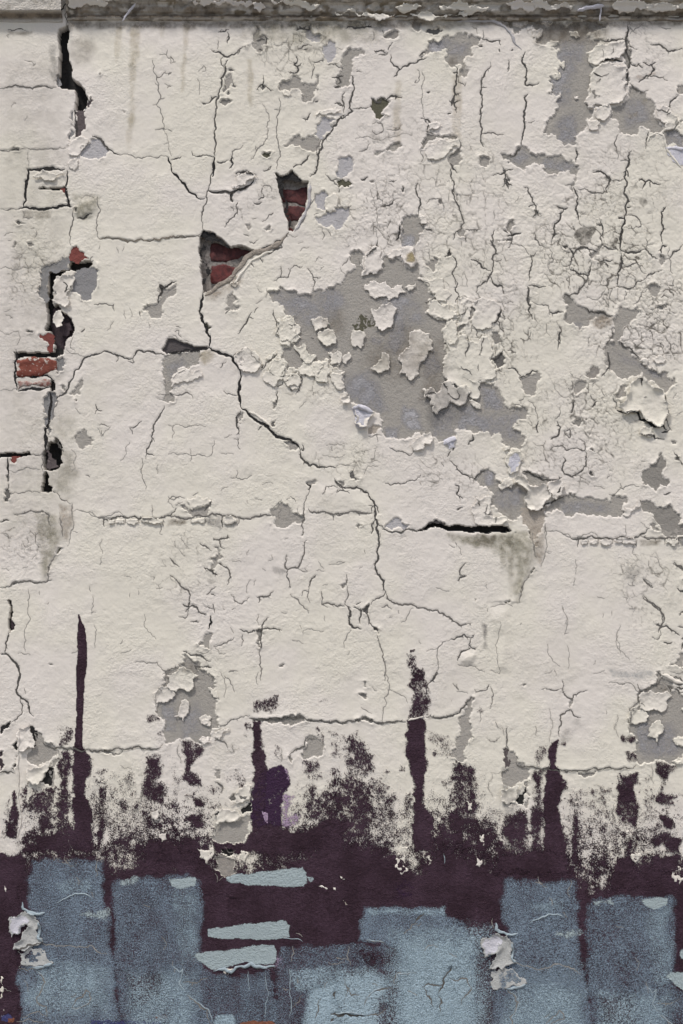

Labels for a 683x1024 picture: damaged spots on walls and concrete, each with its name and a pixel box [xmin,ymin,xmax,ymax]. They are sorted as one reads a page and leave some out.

peeling [335,0,489,77]
peeling [279,76,341,152]
peeling [371,98,389,120]
peeling [480,0,683,192]
peeling [281,156,354,232]
spalling [38,257,98,308]
flaking render [210,243,251,284]
peeling [235,215,683,547]
crack [0,21,683,836]
peeling [153,651,229,745]
peeling [627,672,683,765]
peeling [8,911,54,967]